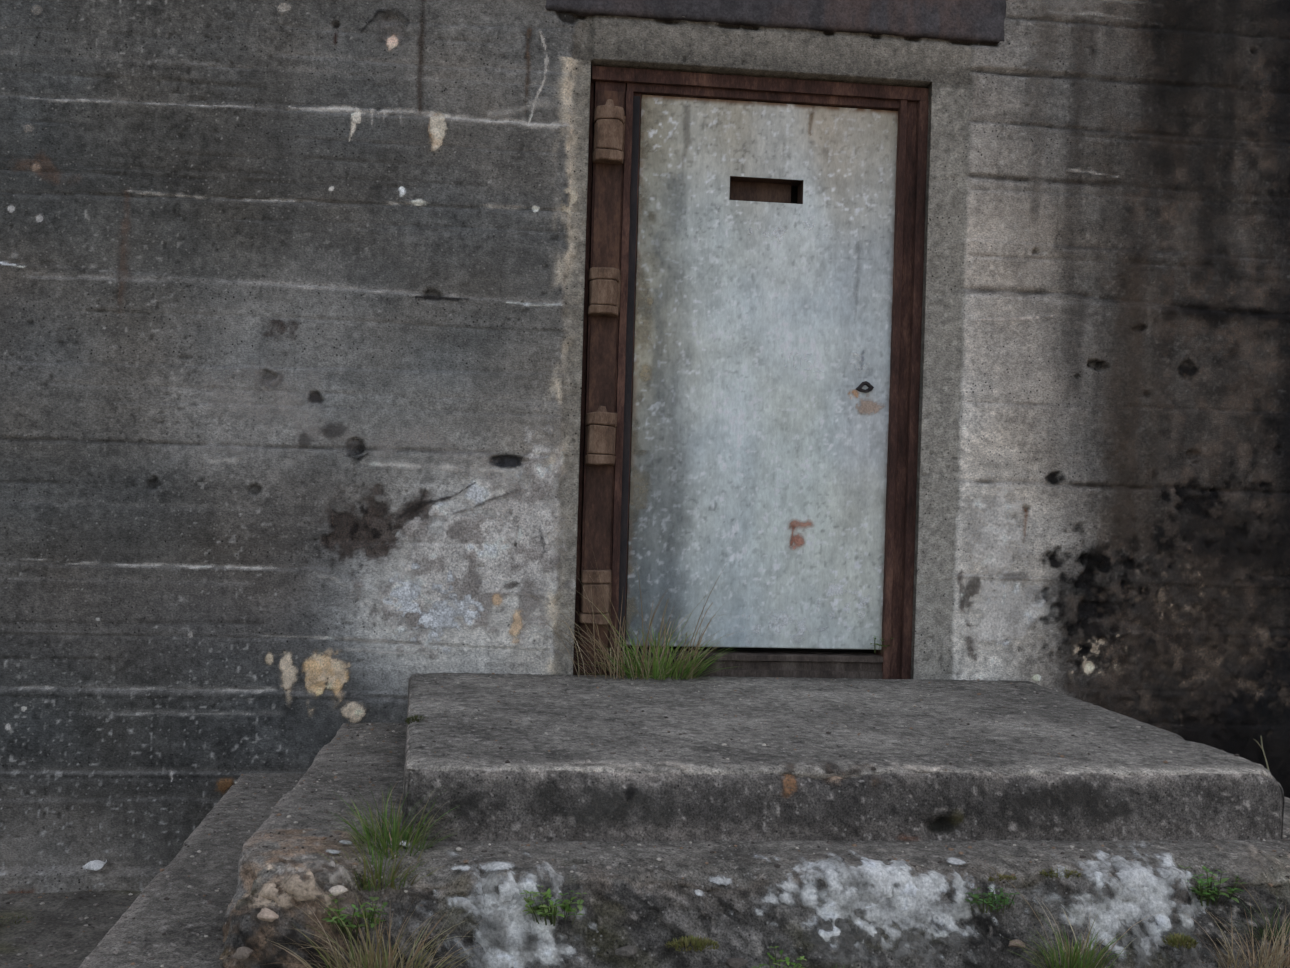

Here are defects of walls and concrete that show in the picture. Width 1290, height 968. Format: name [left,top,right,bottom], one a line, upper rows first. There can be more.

damp [1035,0,1290,798]
peeling [321,426,575,658]
peeling [265,650,365,723]